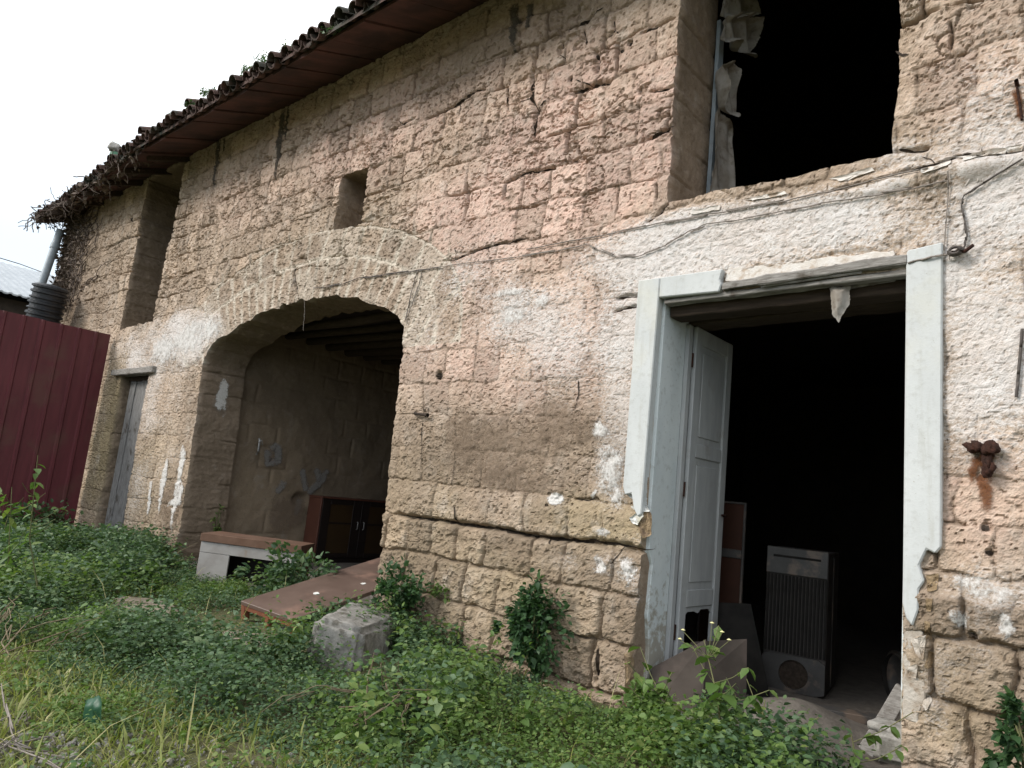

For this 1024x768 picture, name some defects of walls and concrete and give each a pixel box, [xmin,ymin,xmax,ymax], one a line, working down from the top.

crack [437,75,546,138]
corrosion [1012,91,1023,118]
damp [274,107,290,182]
damp [147,445,186,530]
damp [591,422,624,505]
corrosion [967,452,996,510]
spalling [907,573,939,679]